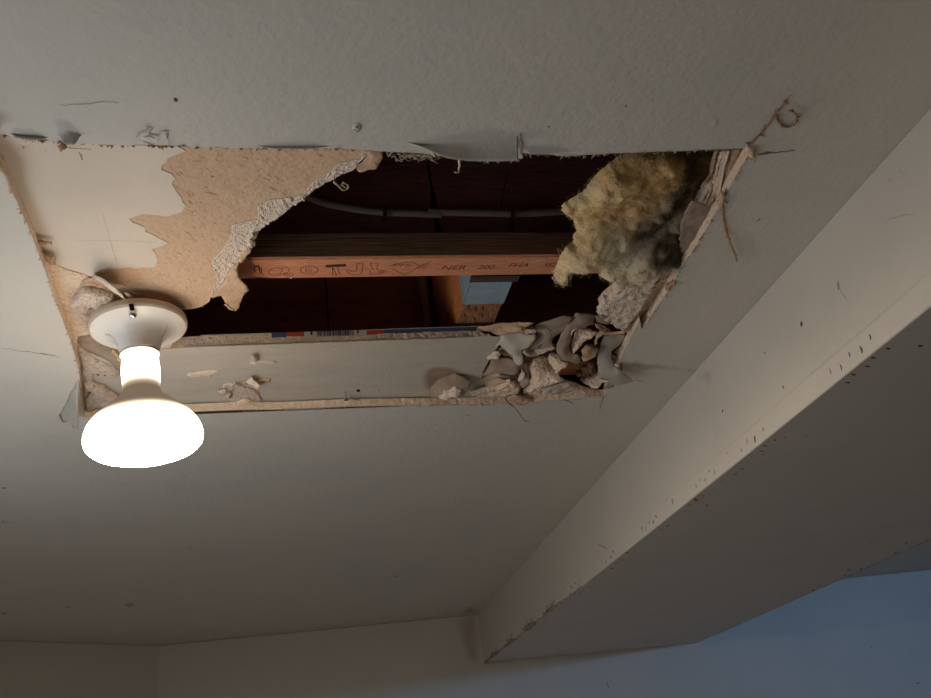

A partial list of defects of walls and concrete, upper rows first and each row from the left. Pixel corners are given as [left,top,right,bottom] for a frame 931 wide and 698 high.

crack [744,94,800,162]
peeling [58,147,367,310]
flaking render [595,273,663,331]
peeling [59,380,91,430]